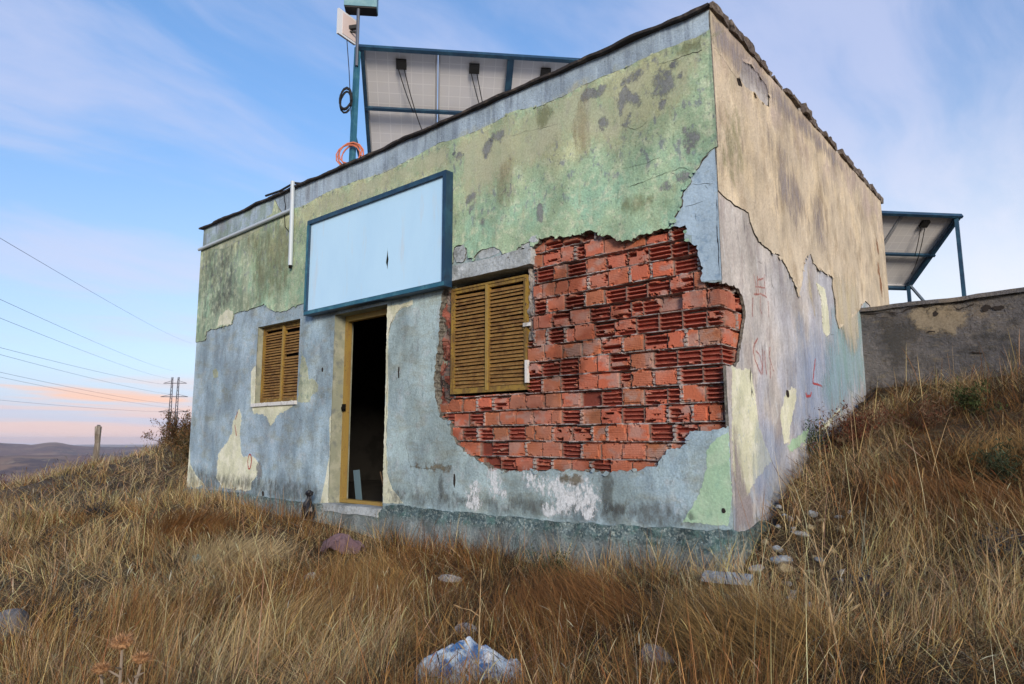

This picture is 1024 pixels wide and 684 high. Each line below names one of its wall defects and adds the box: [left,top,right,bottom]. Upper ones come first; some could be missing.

peeling [737,64,771,105]
water stain [302,59,696,217]
spalling [187,148,869,532]
water stain [462,469,507,511]
water stain [523,472,624,519]